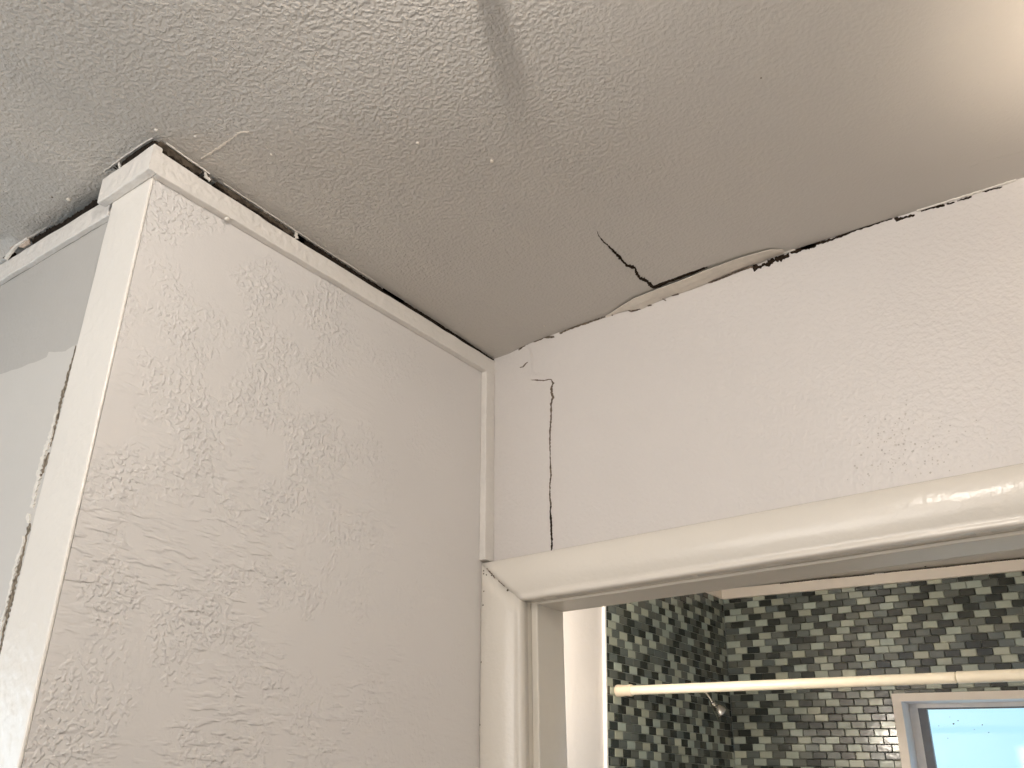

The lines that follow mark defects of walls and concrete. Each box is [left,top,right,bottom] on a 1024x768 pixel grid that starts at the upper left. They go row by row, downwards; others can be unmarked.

crack [3,199,99,260]
crack [103,138,494,360]
crack [518,232,753,550]